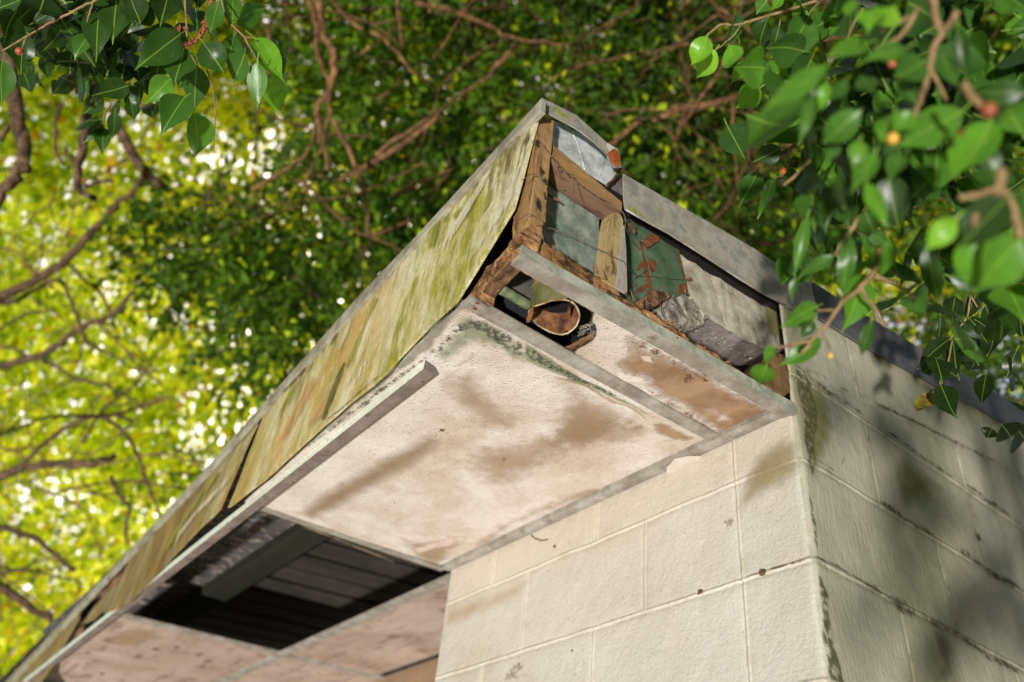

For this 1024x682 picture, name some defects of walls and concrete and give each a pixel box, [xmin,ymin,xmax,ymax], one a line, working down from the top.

water stain [437,133,539,257]
corrosion [633,240,656,293]
corrosion [677,249,688,293]
water stain [308,360,422,446]
water stain [438,320,688,442]
water stain [622,342,765,431]
water stain [309,447,424,515]
peeling [666,456,702,473]